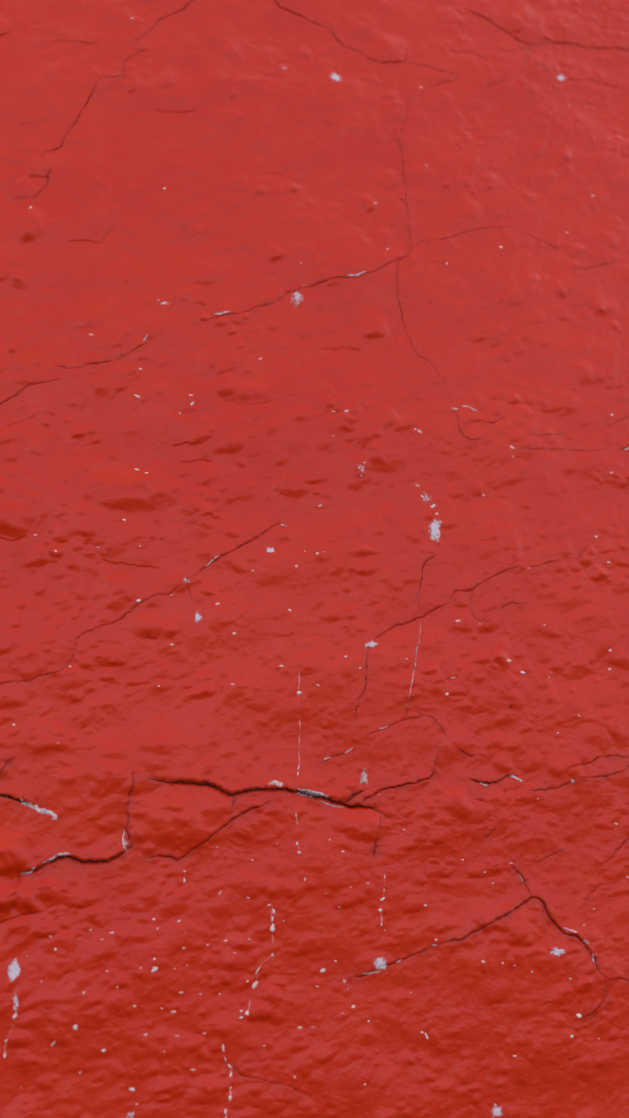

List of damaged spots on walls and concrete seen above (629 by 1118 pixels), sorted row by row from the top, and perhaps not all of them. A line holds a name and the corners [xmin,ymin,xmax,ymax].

crack [0,759,57,820]
crack [17,549,627,879]
crack [359,849,629,1017]